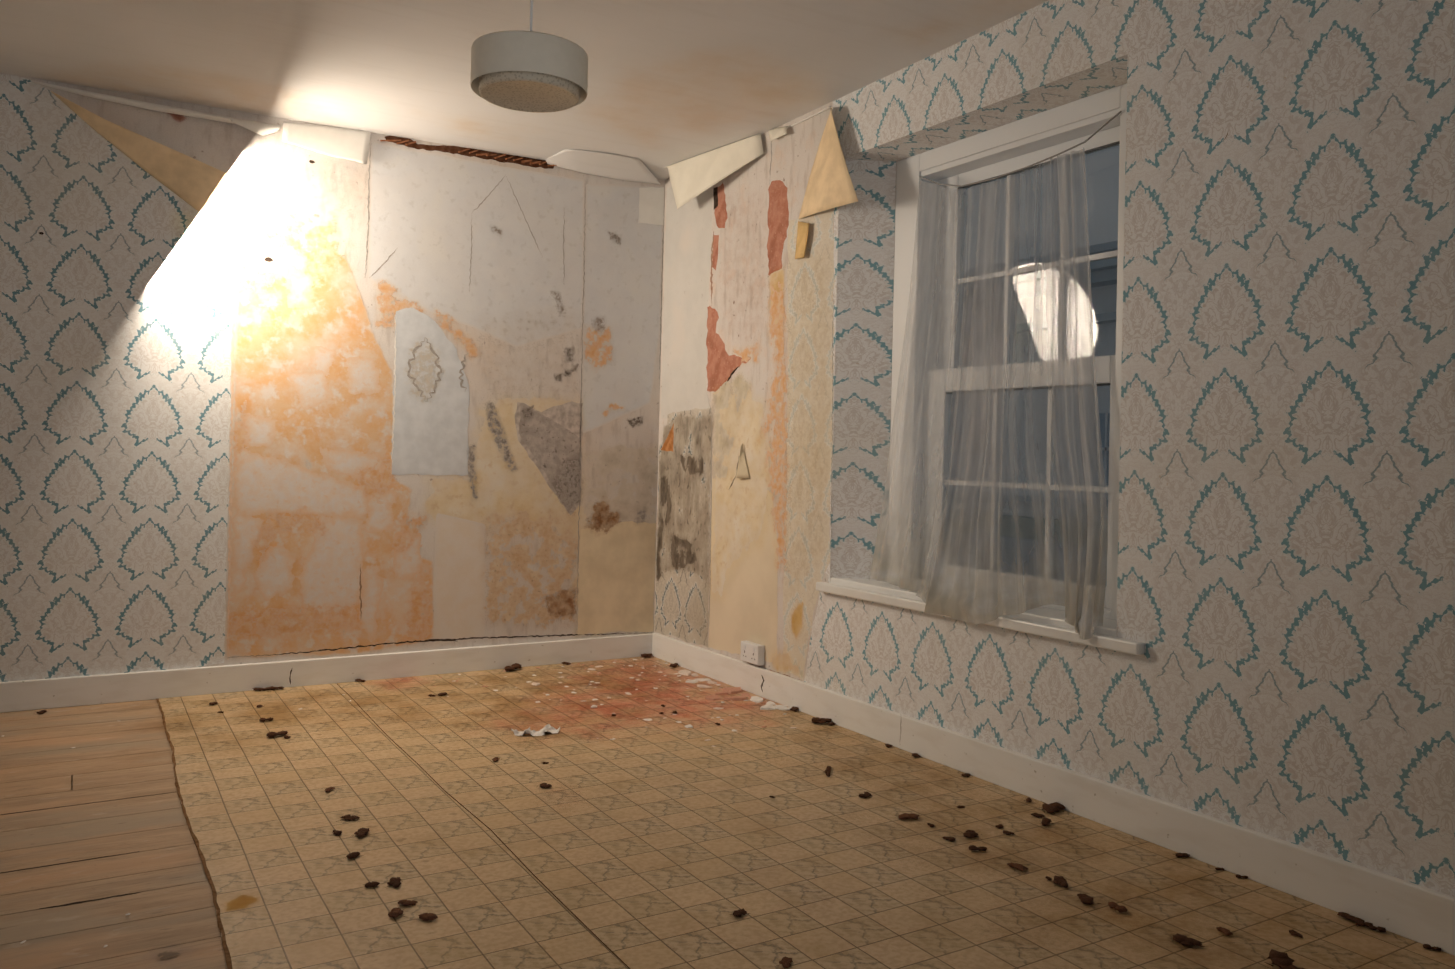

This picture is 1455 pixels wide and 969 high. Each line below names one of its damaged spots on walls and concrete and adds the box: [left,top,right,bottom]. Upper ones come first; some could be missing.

peeling [51,91,234,211]
peeling [229,209,352,309]
flaking render [380,135,557,169]
flaking render [712,183,728,270]
peeling [767,107,858,275]
peeling [289,346,381,410]
flaking render [706,306,751,392]
water stain [425,269,789,646]
peeling [736,443,750,479]
peeling [233,400,397,641]